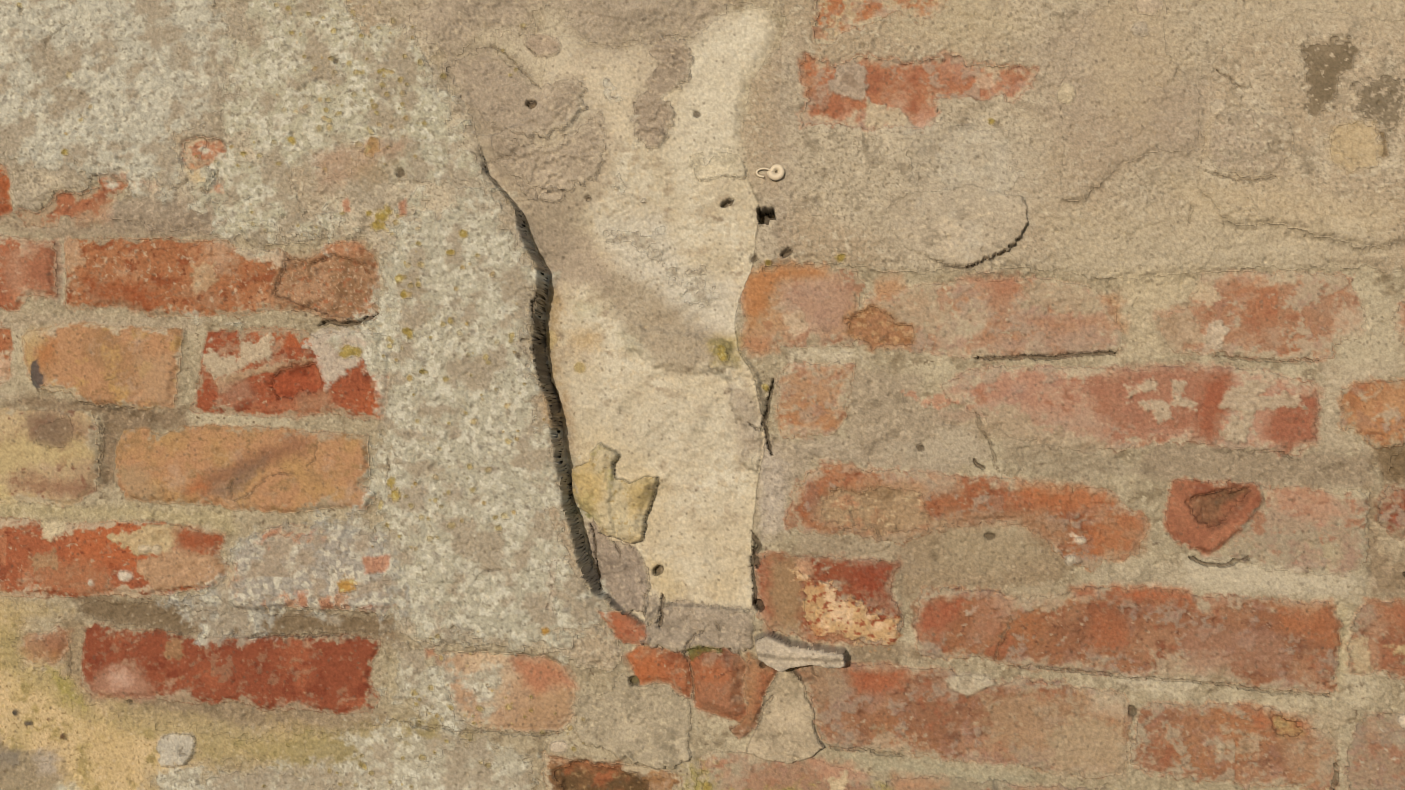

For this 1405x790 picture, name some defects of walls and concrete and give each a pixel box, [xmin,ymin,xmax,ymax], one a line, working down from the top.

spalling [274,255,379,321]
spalling [271,363,322,400]
crack [531,293,563,425]
spalling [844,306,915,351]
crack [749,382,774,455]
spalling [1189,487,1251,528]
crack [750,533,762,601]
spalling [0,602,319,790]
peeling [553,674,692,790]
peeling [747,669,824,764]